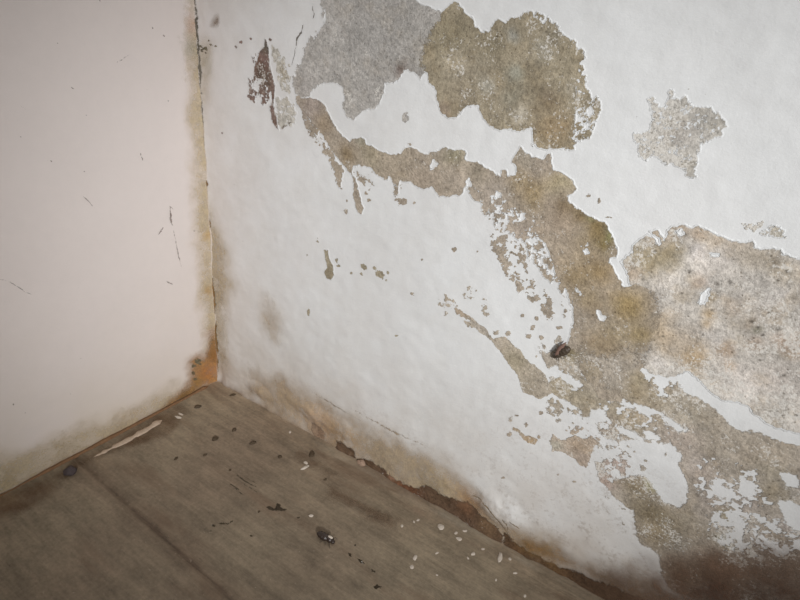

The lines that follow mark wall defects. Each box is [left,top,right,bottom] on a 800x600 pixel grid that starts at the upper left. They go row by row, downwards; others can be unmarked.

peeling [247,0,800,600]
water stain [253,380,525,543]
water stain [587,562,800,600]